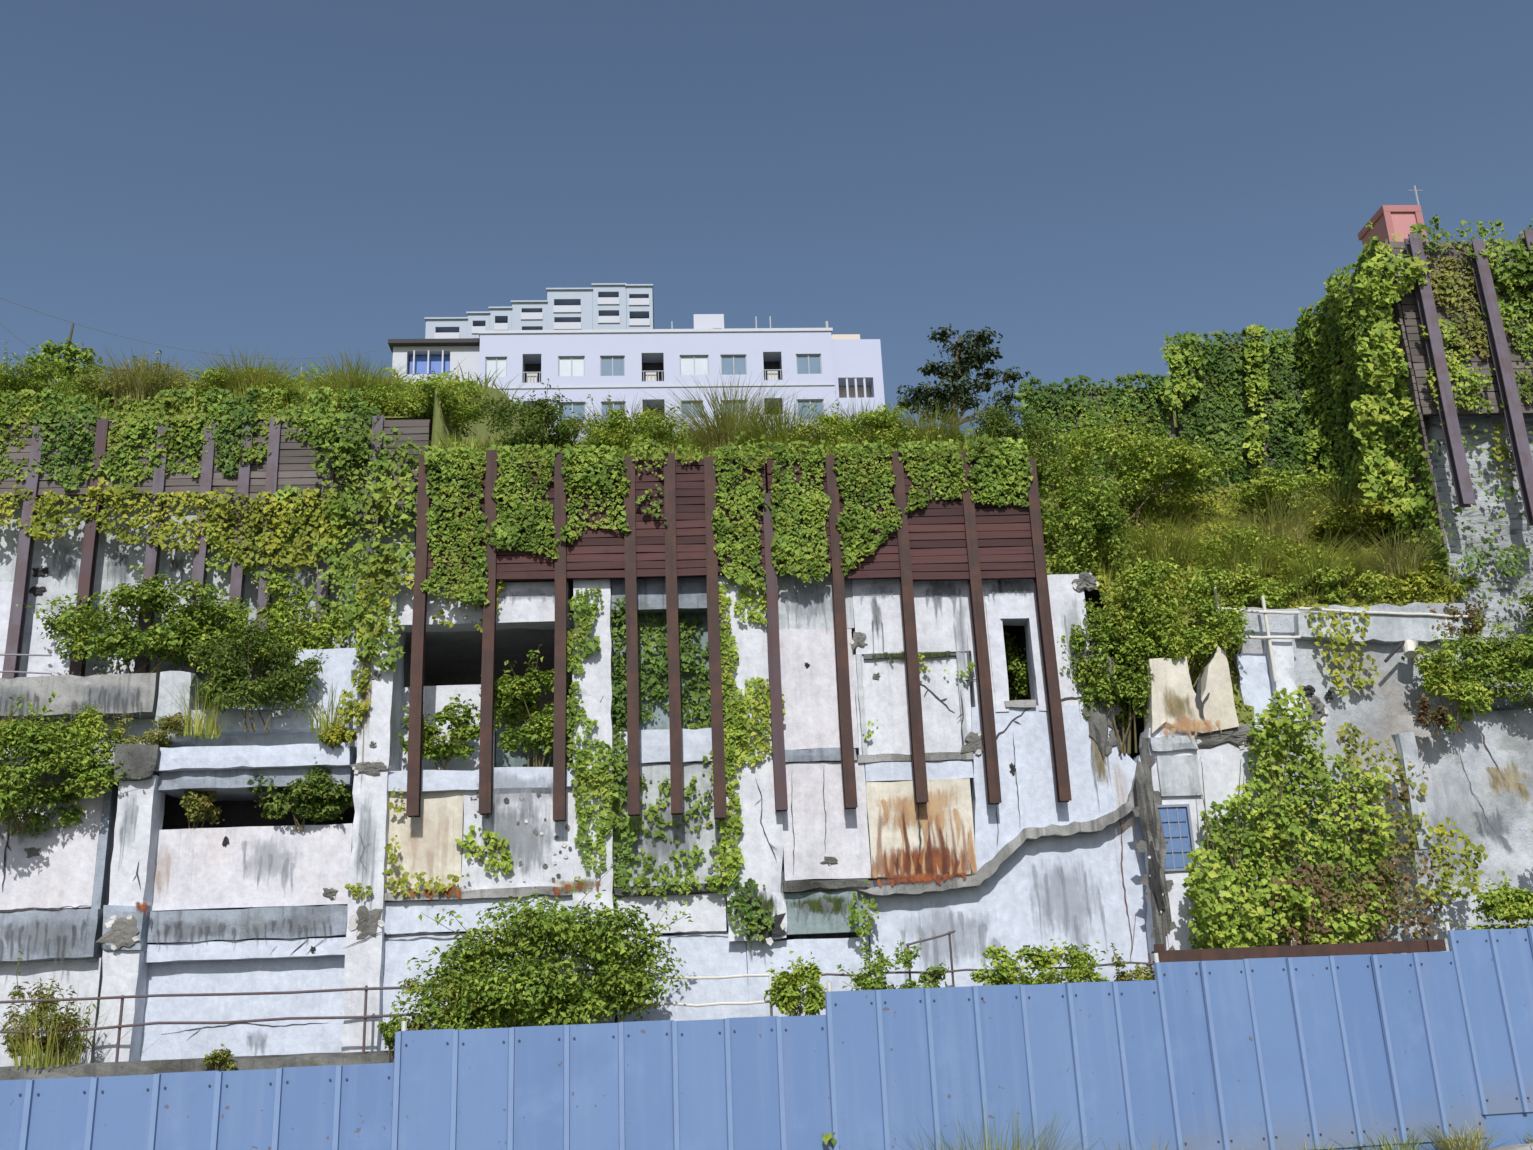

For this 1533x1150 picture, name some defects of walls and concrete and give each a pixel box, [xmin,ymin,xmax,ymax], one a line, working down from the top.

crack [756,773,826,872]
rust [872,792,977,887]
spalling [323,886,338,900]
water stain [0,920,85,963]
spalling [96,915,140,950]
spalling [348,905,386,939]